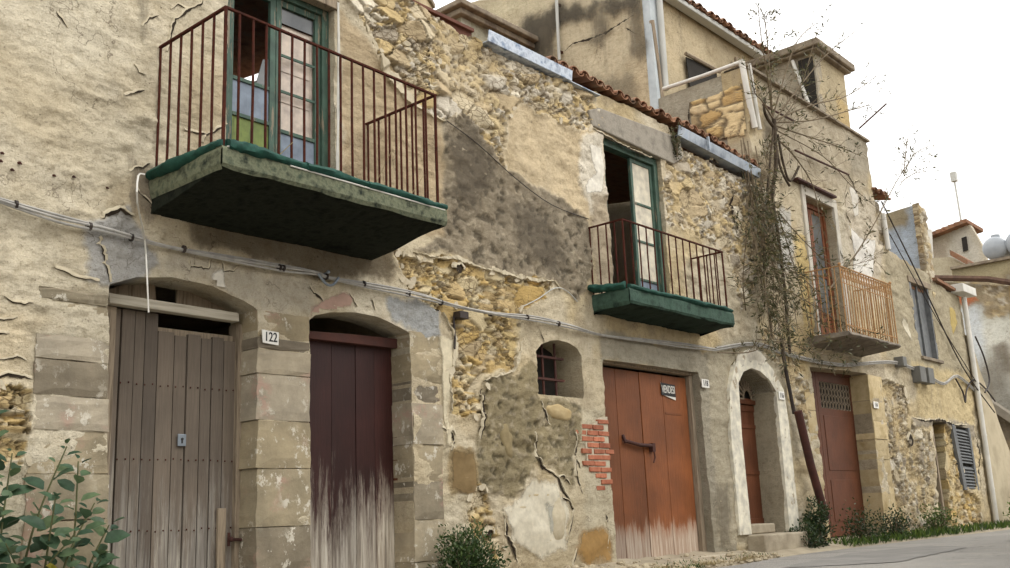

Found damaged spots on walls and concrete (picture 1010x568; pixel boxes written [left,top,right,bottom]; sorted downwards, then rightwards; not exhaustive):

crack [141,0,203,51]
crack [565,19,630,51]
crack [124,63,146,96]
spalling [346,0,605,168]
peeling [586,144,604,193]
crack [0,295,34,379]
spalling [394,248,561,446]
spalling [0,379,34,466]
peeling [466,480,569,562]
crack [534,400,583,566]
flaking render [576,417,614,490]
peeling [564,550,783,568]